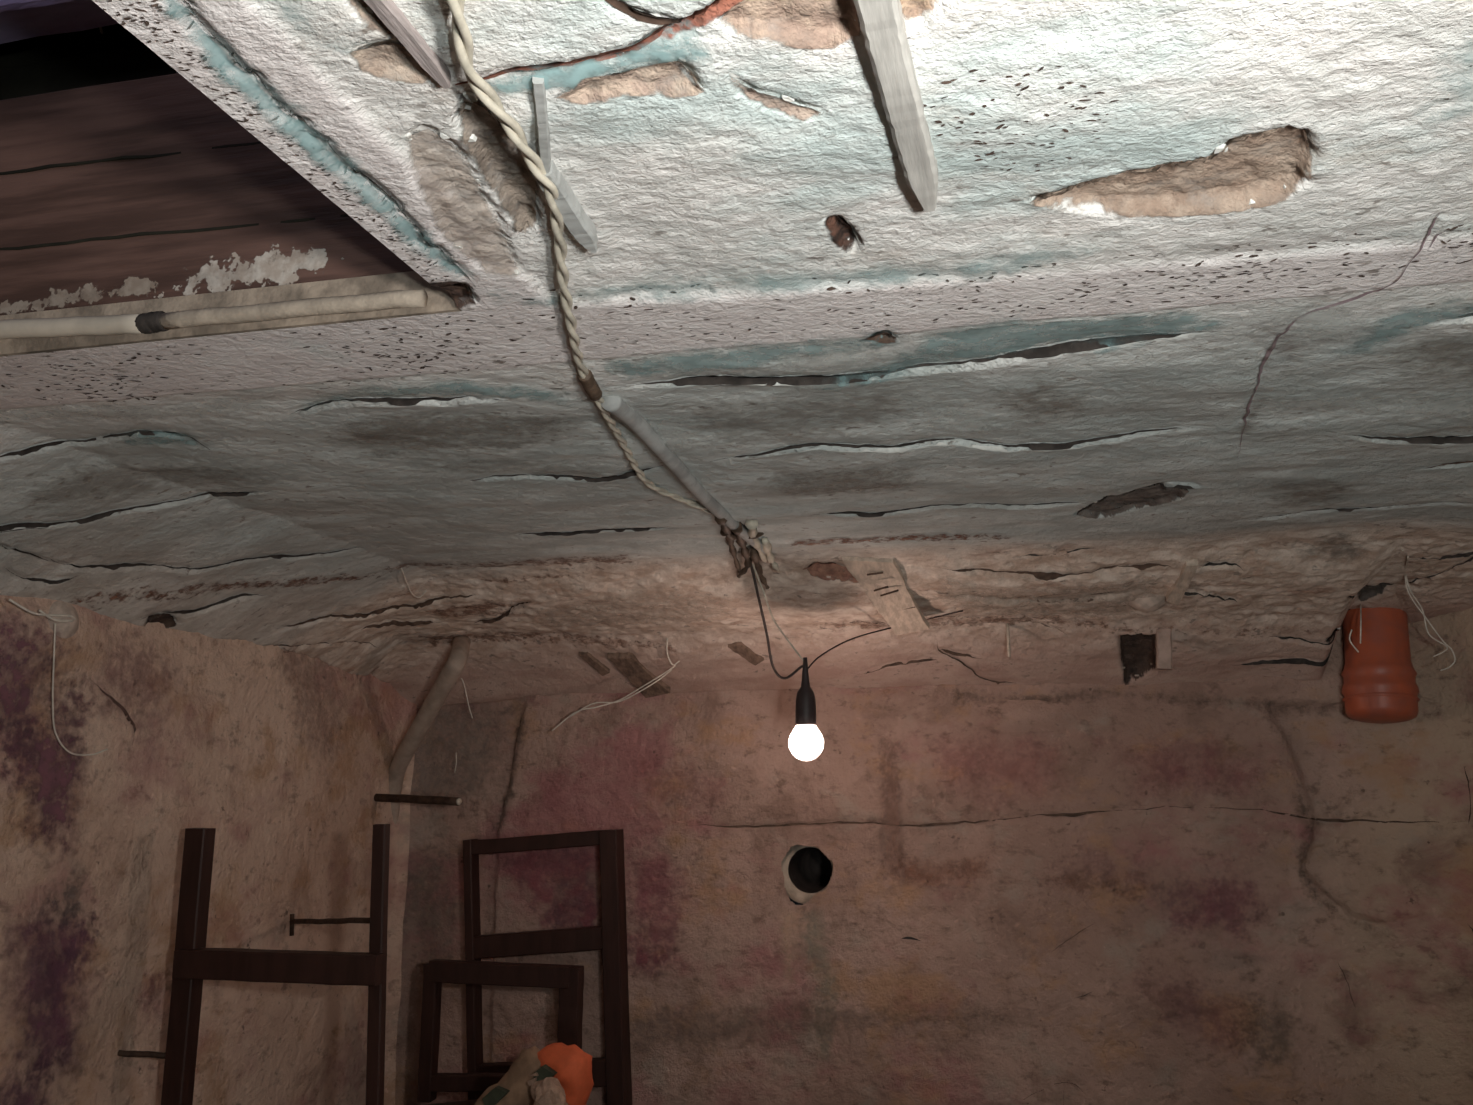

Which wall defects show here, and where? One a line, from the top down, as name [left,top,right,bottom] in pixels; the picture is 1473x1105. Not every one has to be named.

crack [455,0,713,85]
spalling [496,0,860,105]
spalling [199,31,538,309]
spalling [1032,125,1312,218]
spalling [826,215,857,252]
crack [617,331,1222,390]
crack [710,213,1445,463]
crack [0,491,356,620]
crack [273,595,528,648]
spalling [1120,633,1156,685]
damp [0,612,82,852]
damp [0,886,89,1105]